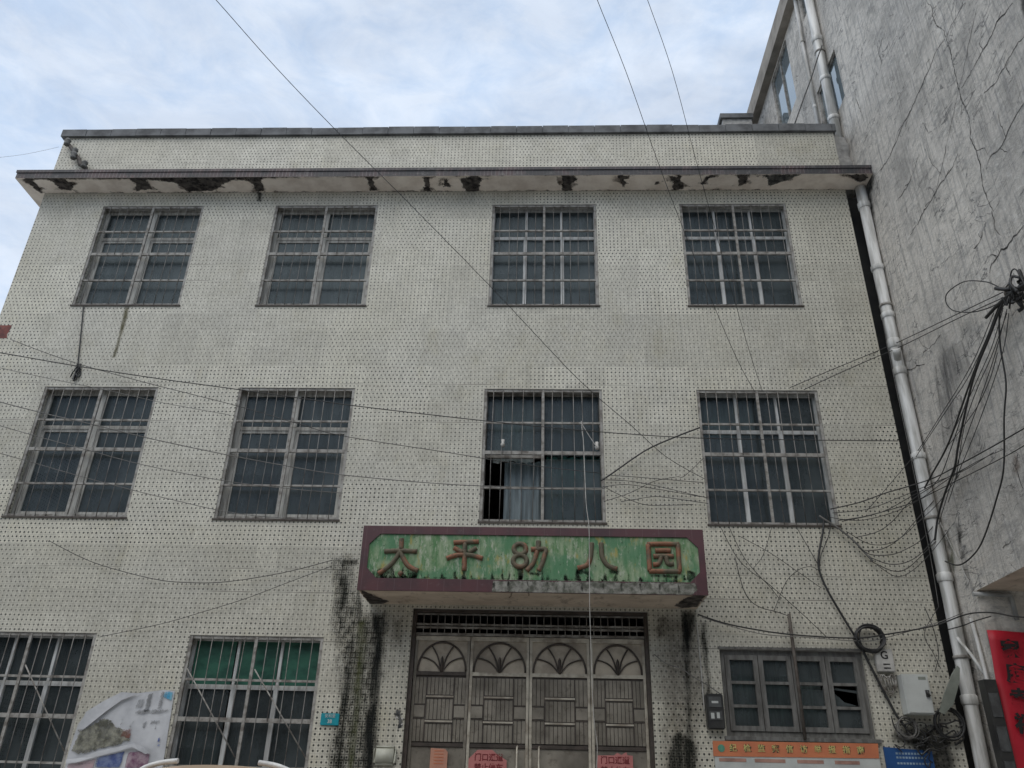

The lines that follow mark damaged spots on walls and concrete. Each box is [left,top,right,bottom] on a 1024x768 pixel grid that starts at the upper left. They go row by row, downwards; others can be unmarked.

crack [880,3,1024,273]
peeling [24,178,77,193]
peeling [129,177,266,201]
peeling [423,176,483,192]
peeling [558,175,578,191]
peeling [654,175,687,190]
peeling [737,174,800,186]
peeling [842,174,868,182]
leakage [682,612,710,693]
leakage [329,560,386,768]
leakage [669,729,696,768]